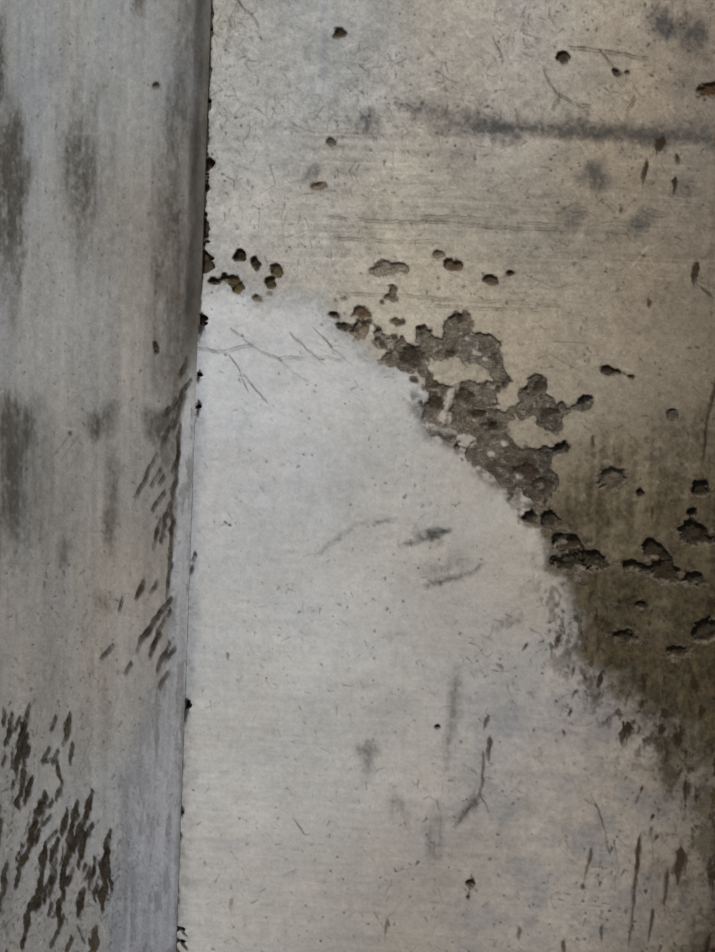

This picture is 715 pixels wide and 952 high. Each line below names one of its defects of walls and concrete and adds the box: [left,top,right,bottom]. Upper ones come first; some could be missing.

spalling [696,82,715,98]
spalling [369,259,409,303]
spalling [482,270,515,285]
spalling [328,306,707,588]
spalling [674,479,715,549]
spalling [613,626,639,645]
spalling [666,616,715,662]
leakage [574,558,715,776]
corrosion [618,721,640,741]
corrosion [658,708,682,745]
peeling [0,704,113,952]